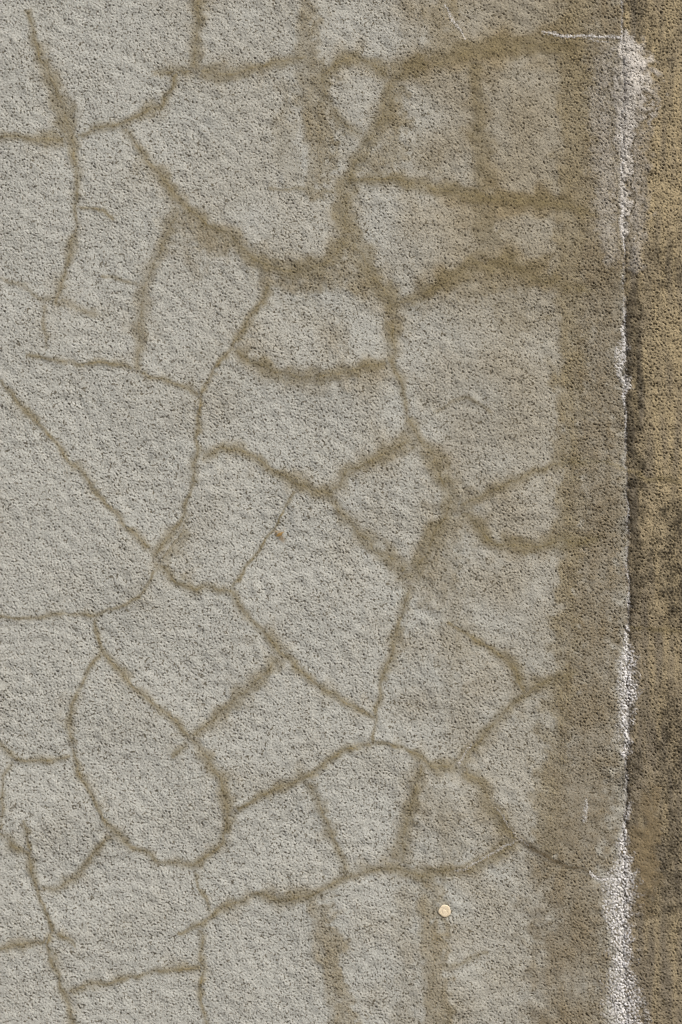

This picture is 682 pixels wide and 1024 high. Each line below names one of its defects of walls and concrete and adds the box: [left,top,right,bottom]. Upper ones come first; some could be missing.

crack [445,5,621,55]
leakage [602,0,659,250]
crack [31,355,120,365]
crack [89,51,597,681]
leakage [553,297,646,789]
leakage [652,506,682,623]
crack [11,754,158,862]
crack [1,842,231,1015]
crack [70,614,475,865]
crack [373,811,605,880]
leakage [537,800,677,1024]
leakage [658,700,682,793]